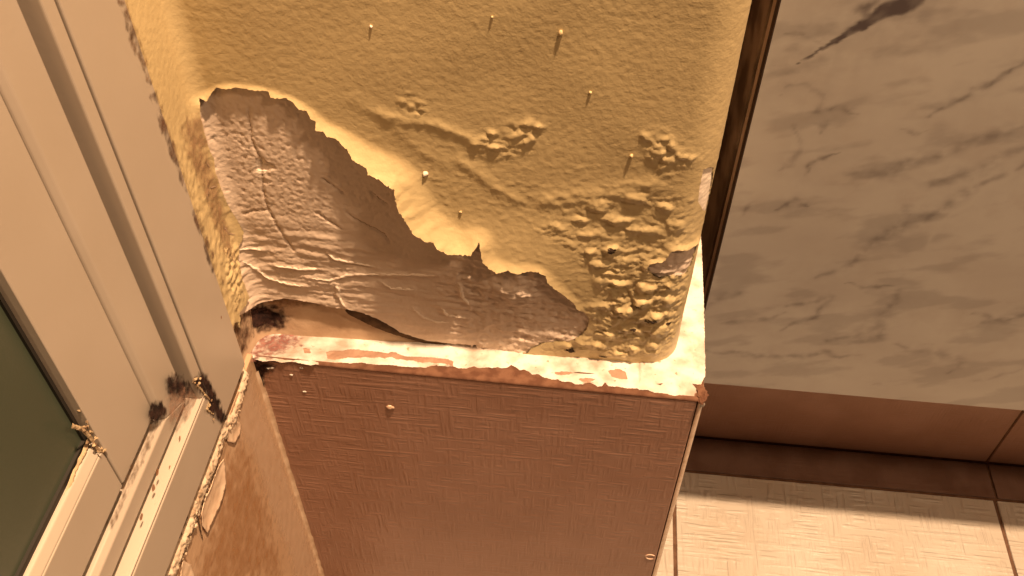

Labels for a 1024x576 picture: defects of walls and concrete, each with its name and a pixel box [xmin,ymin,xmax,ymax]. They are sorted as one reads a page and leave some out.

peeling [181,67,599,361]
water stain [234,298,311,385]
mould [148,373,235,426]
spalling [694,385,709,408]